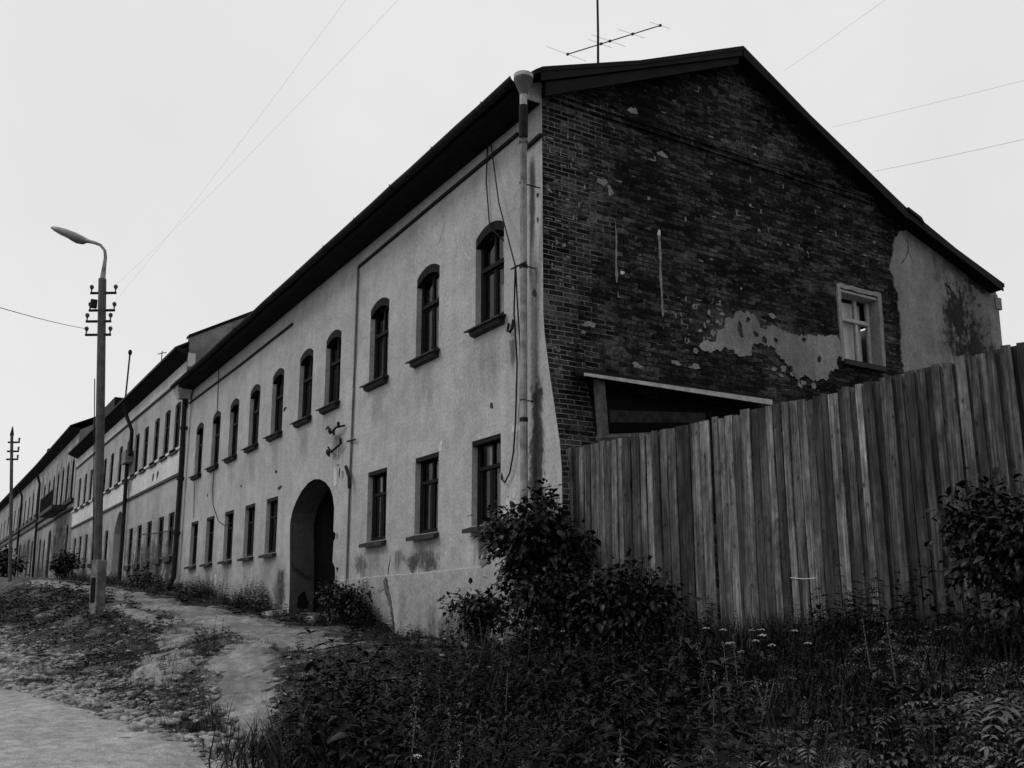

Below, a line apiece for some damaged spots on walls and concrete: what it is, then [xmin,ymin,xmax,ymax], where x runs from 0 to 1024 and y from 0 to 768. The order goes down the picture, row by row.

spalling [536,136,635,258]
peeling [662,297,842,389]
damp [942,286,993,361]
damp [528,377,545,512]
damp [403,551,435,571]